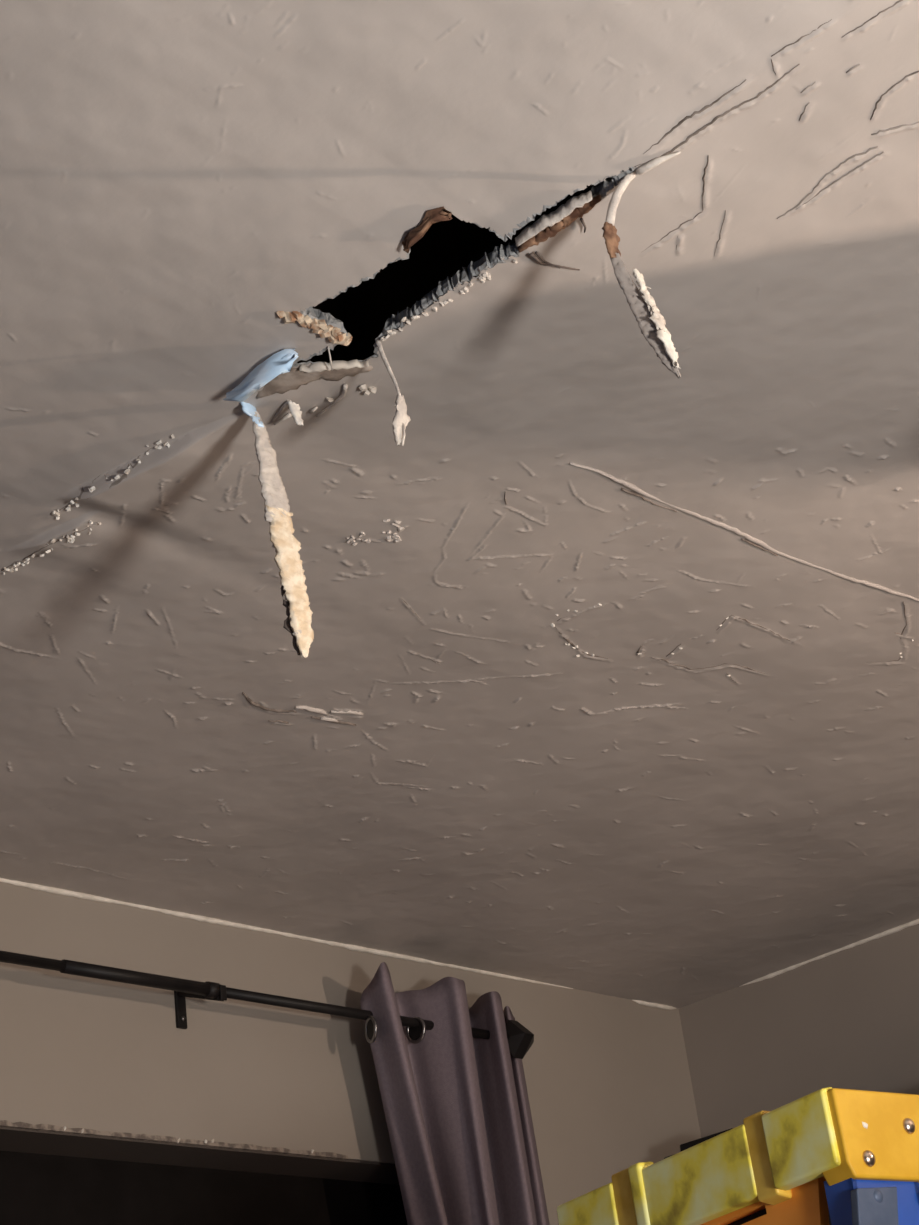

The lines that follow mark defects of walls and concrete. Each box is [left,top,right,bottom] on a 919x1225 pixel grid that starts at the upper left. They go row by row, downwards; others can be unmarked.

crack [635,0,919,255]
spalling [276,182,601,363]
crack [622,488,677,512]
spalling [346,519,405,546]
crack [742,538,778,556]